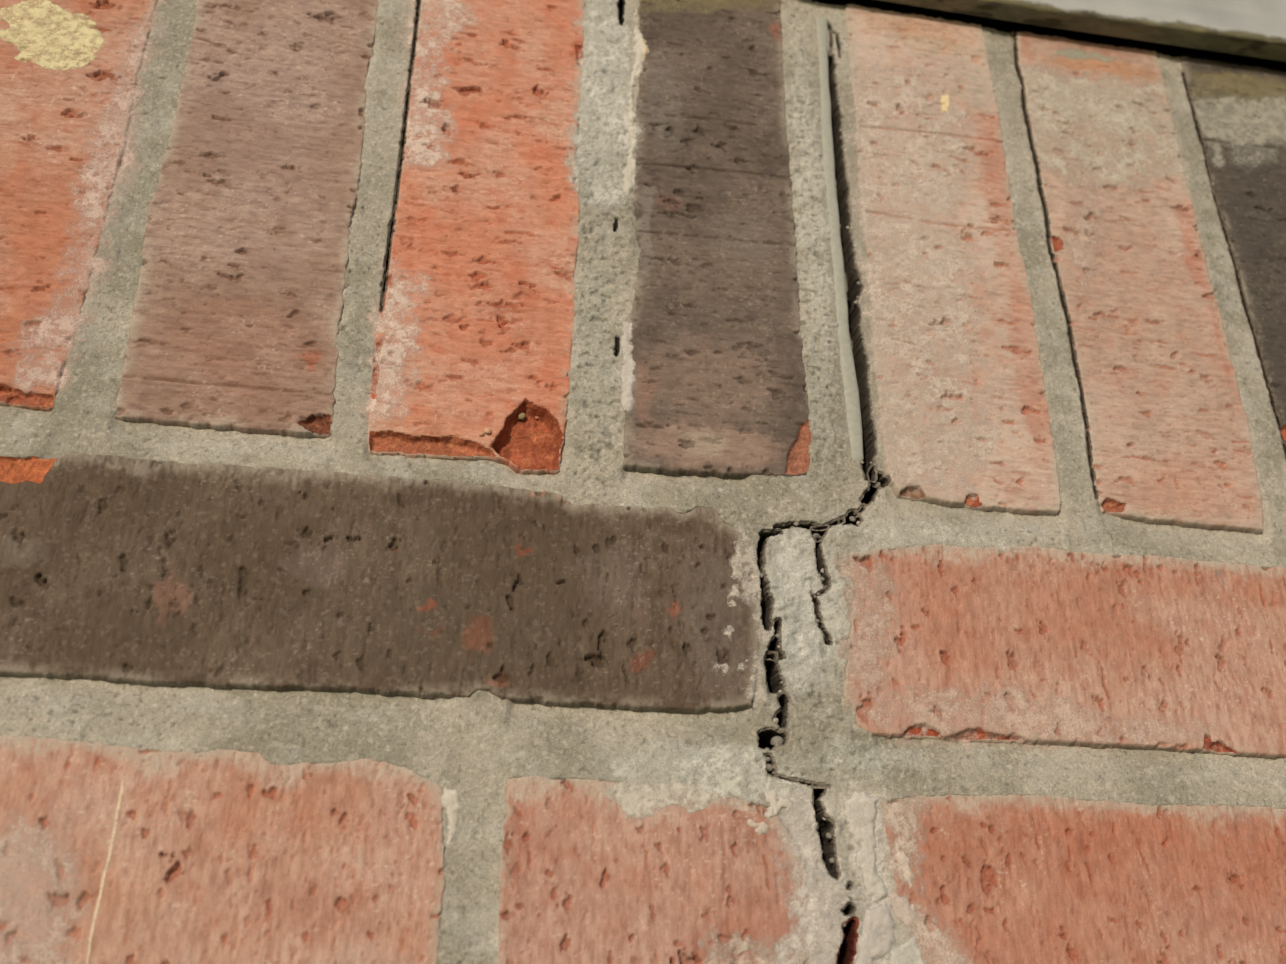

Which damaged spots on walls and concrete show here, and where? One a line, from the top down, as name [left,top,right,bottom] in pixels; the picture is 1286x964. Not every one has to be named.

spalling [0,456,57,484]
spalling [369,398,564,470]
crack [756,21,892,964]
water stain [603,742,843,964]
water stain [882,792,925,890]
water stain [907,906,971,964]